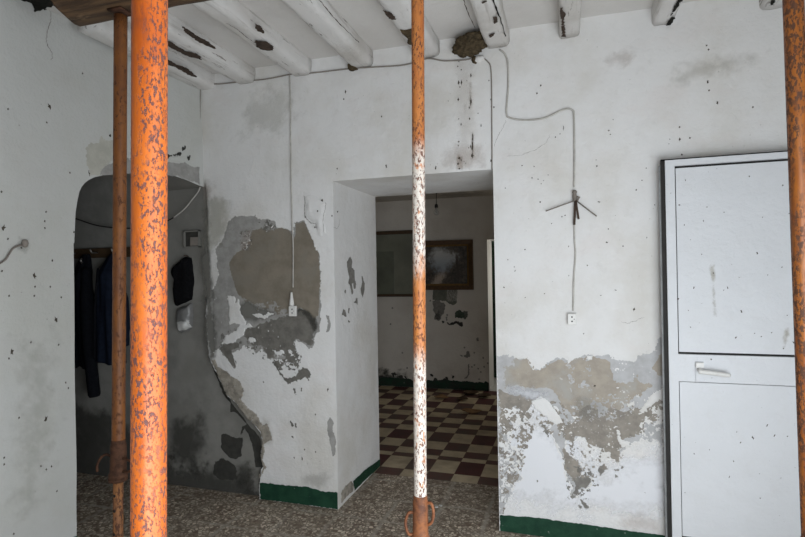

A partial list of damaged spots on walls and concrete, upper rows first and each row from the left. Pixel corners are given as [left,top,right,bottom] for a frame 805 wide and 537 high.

peeling [168,60,197,77]
peeling [255,24,274,51]
peeling [342,257,365,323]
peeling [430,290,468,327]
peeling [205,214,331,482]
water stain [75,408,112,476]
water stain [167,422,254,495]
peeling [460,336,664,514]